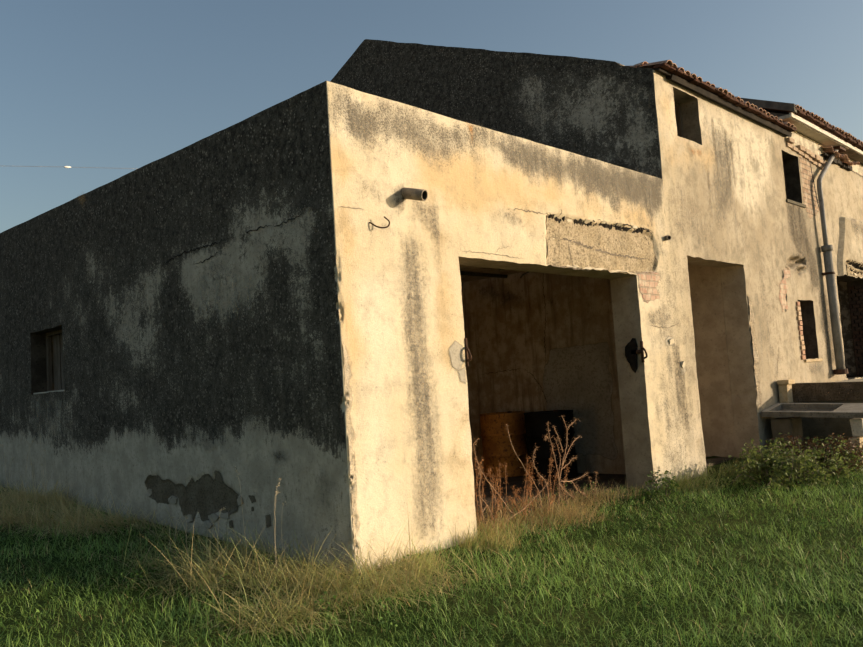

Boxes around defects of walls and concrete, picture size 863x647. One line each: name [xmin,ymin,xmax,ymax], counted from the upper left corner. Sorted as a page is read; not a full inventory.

flaking render [799,155,819,219]
spalling [821,146,860,171]
crack [160,239,226,266]
crack [246,214,301,233]
spalling [545,215,660,303]
flaking render [779,253,807,312]
spalling [845,262,863,277]
water stain [400,240,442,534]
peeling [449,341,466,383]
peeling [144,471,256,529]